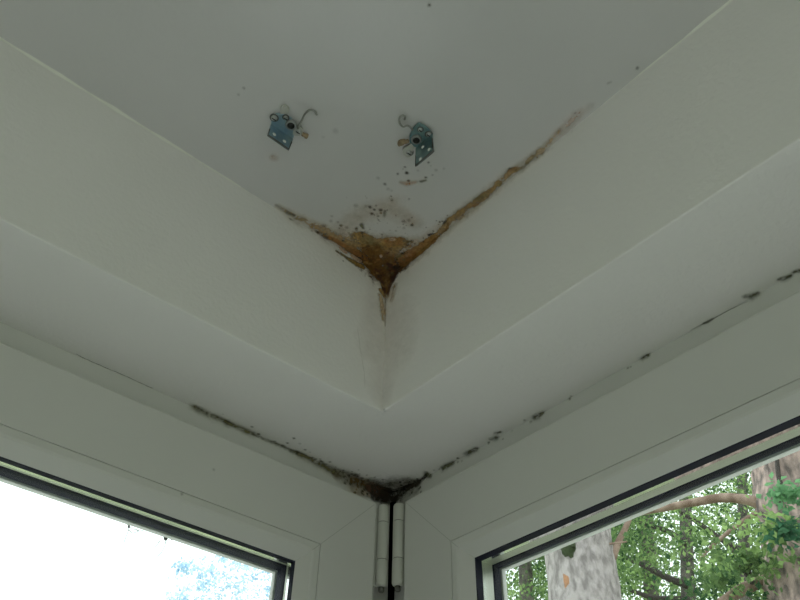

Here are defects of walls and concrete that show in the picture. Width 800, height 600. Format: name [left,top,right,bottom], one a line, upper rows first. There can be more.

damp [193,405,432,504]